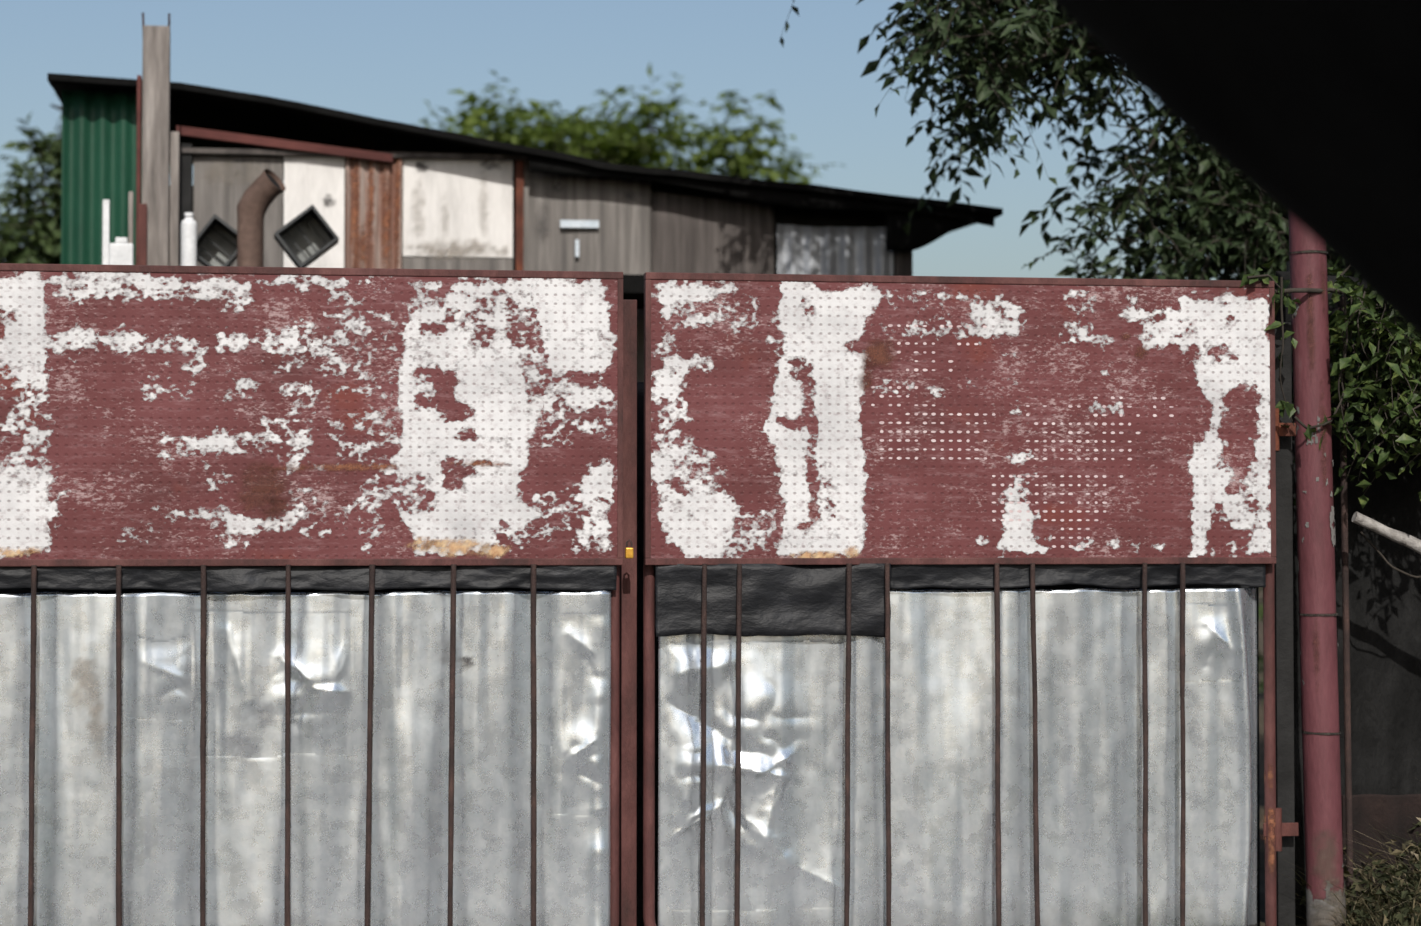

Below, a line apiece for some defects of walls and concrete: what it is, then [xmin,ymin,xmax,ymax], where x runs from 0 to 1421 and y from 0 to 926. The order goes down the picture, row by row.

peeling [0,271,617,559]
peeling [651,280,1174,558]
peeling [1119,291,1271,557]
peeling [1295,406,1336,547]
rust [1264,809,1275,866]